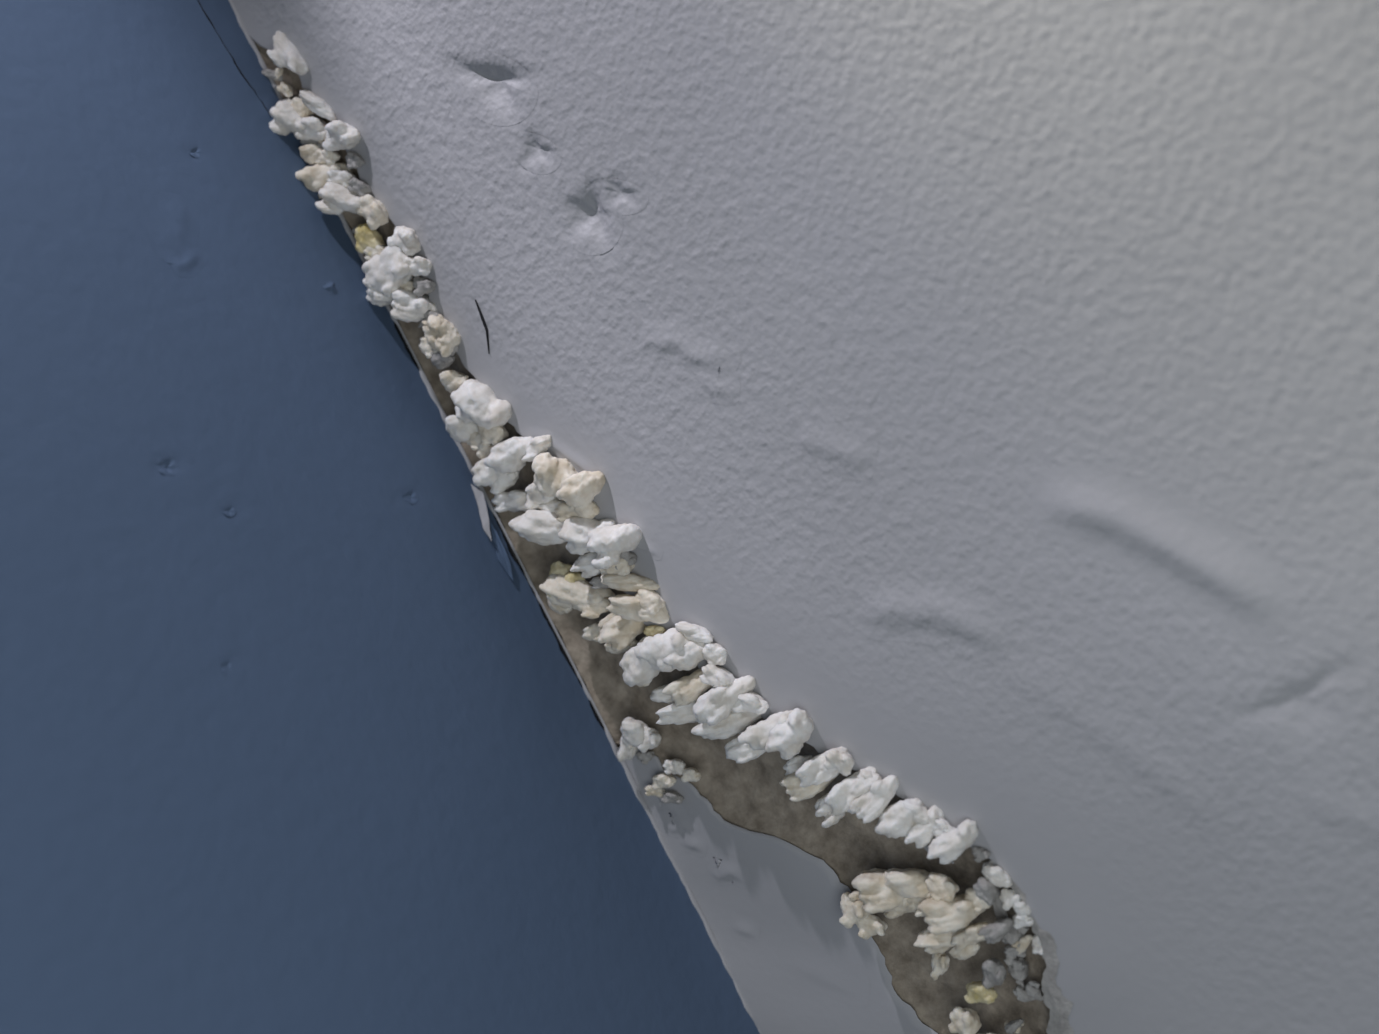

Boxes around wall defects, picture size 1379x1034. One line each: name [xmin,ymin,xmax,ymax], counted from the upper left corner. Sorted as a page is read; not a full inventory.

crack [394,322,419,370]
crack [492,512,605,731]
crack [524,424,663,560]
water stain [267,31,1043,1034]